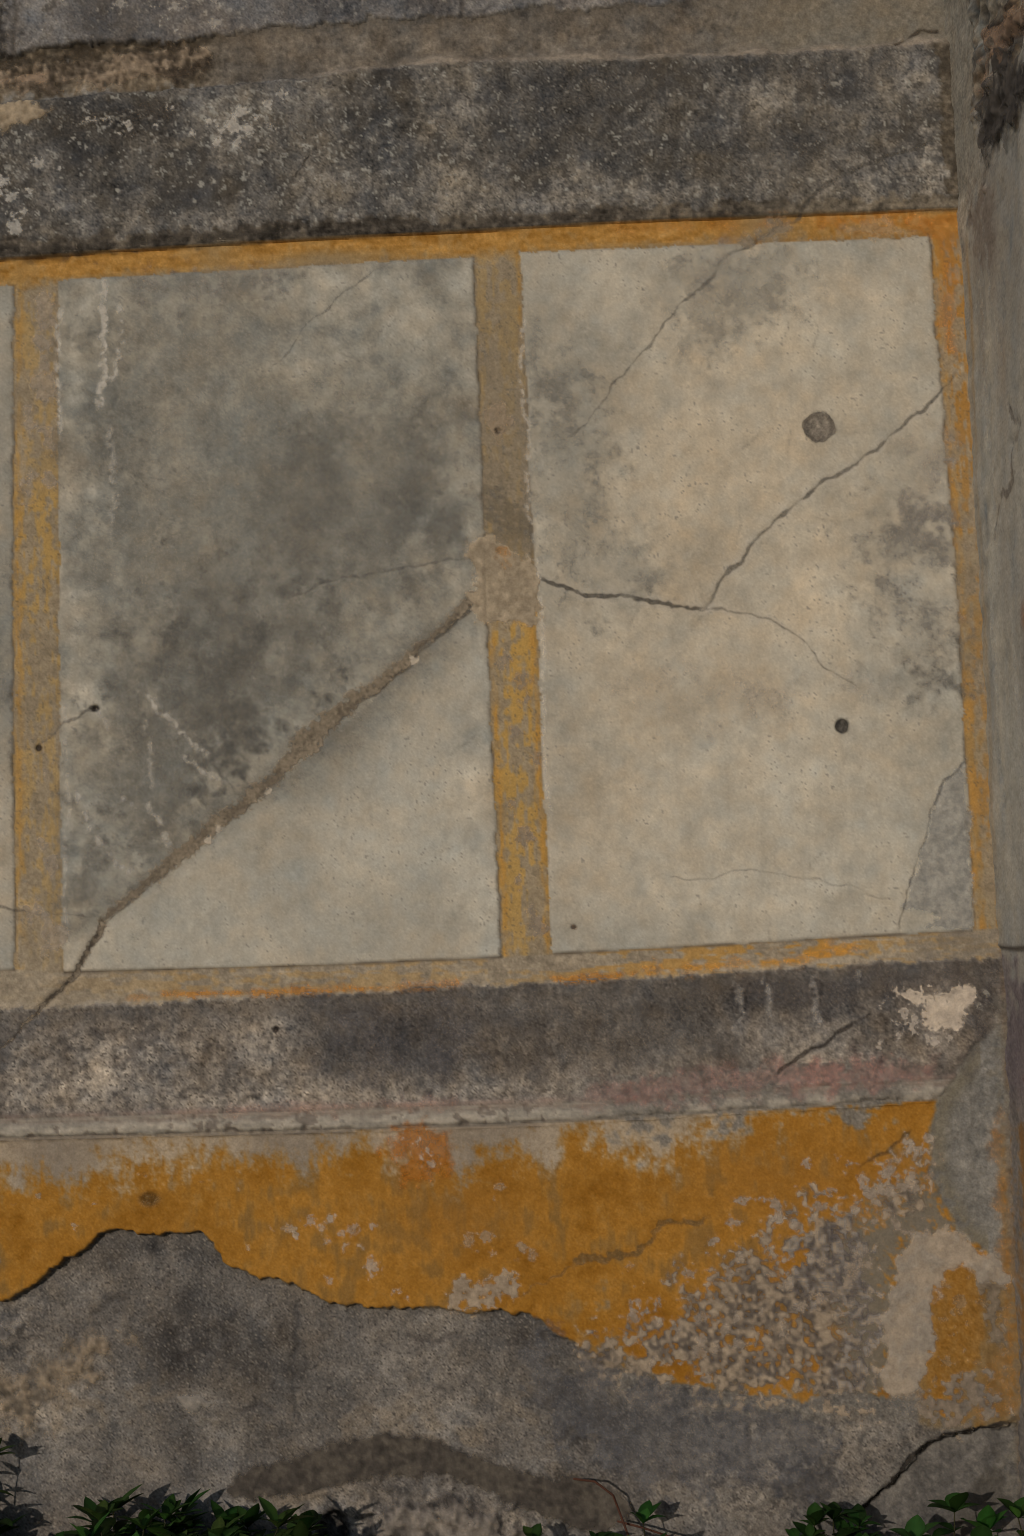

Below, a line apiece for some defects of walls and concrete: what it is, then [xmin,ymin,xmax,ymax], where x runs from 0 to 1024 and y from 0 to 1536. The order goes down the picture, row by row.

spalling [0,0,212,96]
spalling [974,0,1024,160]
crack [543,549,749,610]
crack [2,591,474,1047]
crack [778,1015,868,1073]
spalling [876,985,976,1050]
spalling [0,1131,1022,1536]